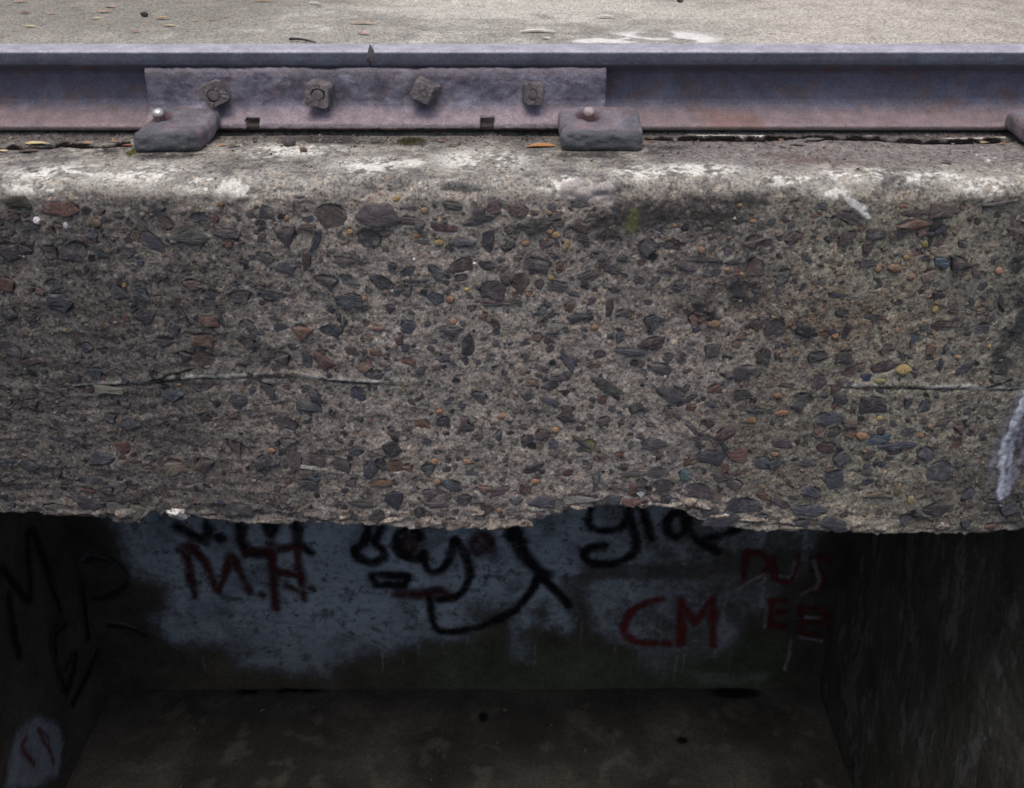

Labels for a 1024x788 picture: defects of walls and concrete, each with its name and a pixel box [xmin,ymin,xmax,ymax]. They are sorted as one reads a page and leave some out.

crack [72,368,394,386]
crack [827,378,1024,391]